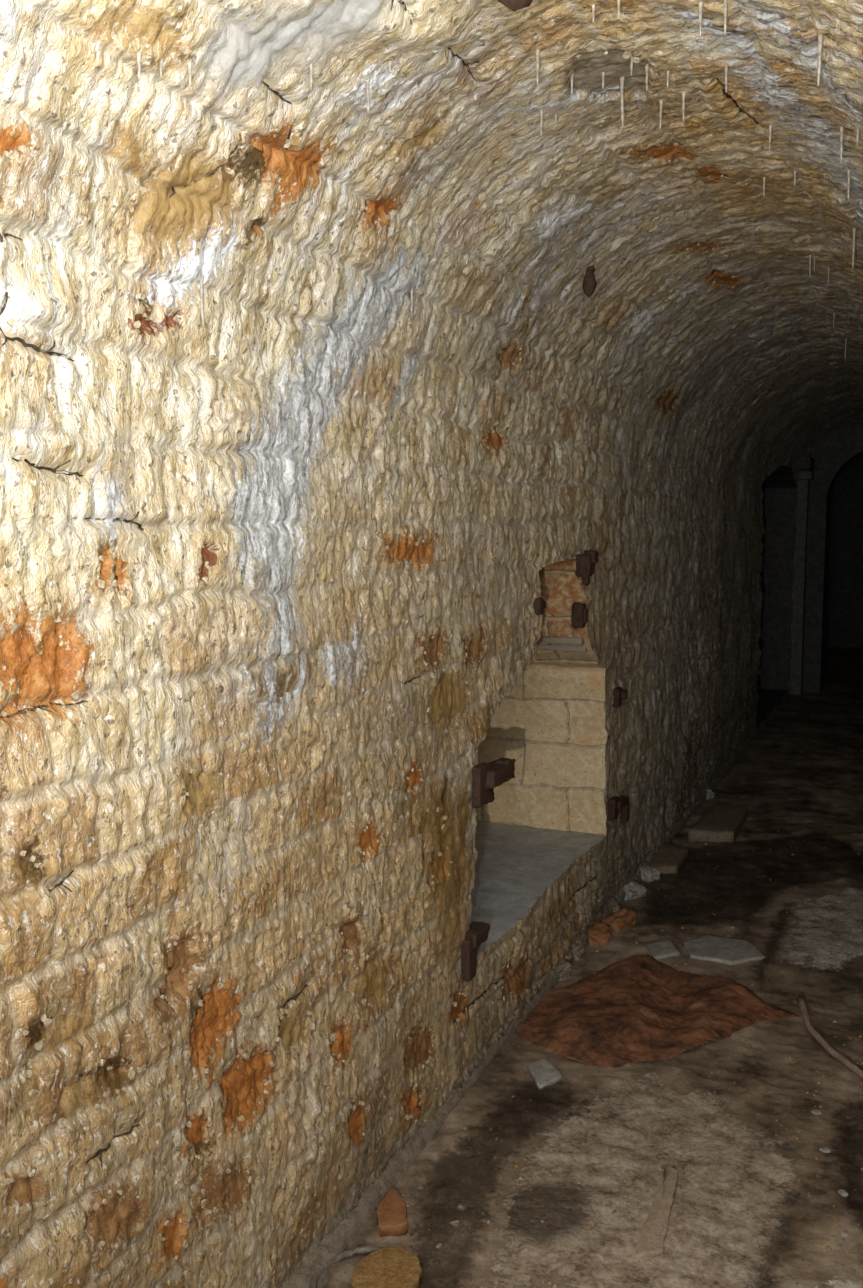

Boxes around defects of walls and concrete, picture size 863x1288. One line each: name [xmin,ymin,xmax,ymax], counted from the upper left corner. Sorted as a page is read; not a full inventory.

crack [716,78,764,128]
crack [0,232,22,242]
crack [0,292,75,361]
crack [12,458,84,477]
leakage [211,235,444,754]